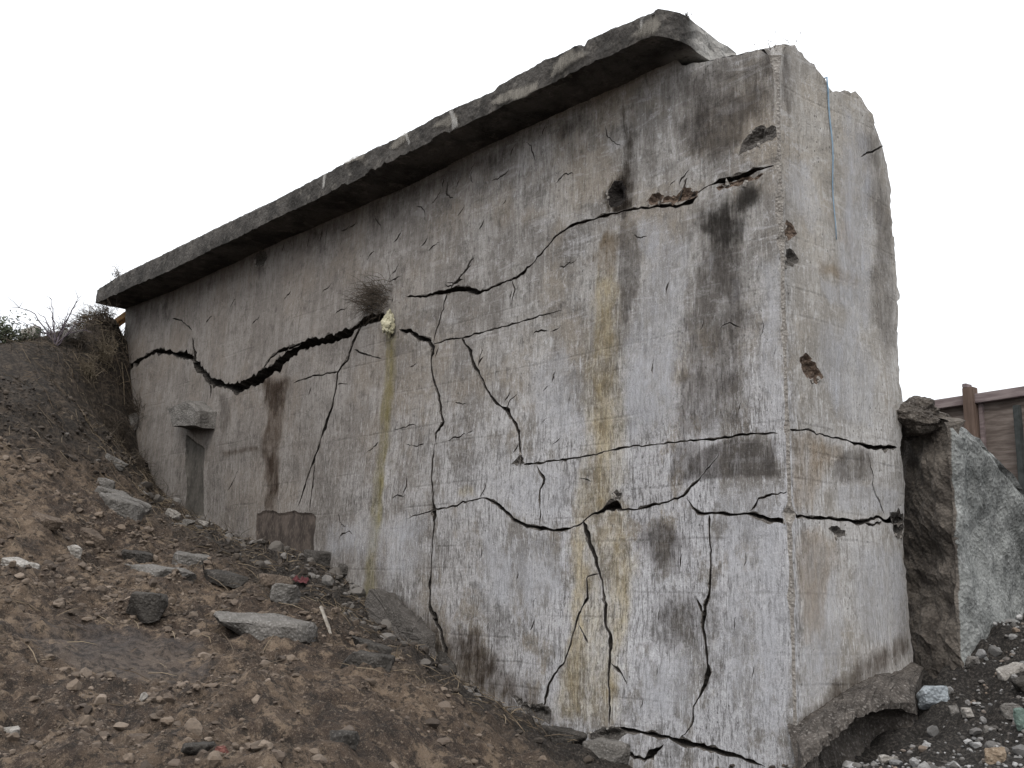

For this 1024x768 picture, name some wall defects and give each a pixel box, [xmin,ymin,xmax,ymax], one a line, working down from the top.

spalling [738,125,777,156]
spalling [606,180,627,208]
spalling [646,186,698,206]
spalling [784,220,799,269]
spalling [799,353,823,384]
crack [130,165,904,767]
spalling [890,508,904,539]